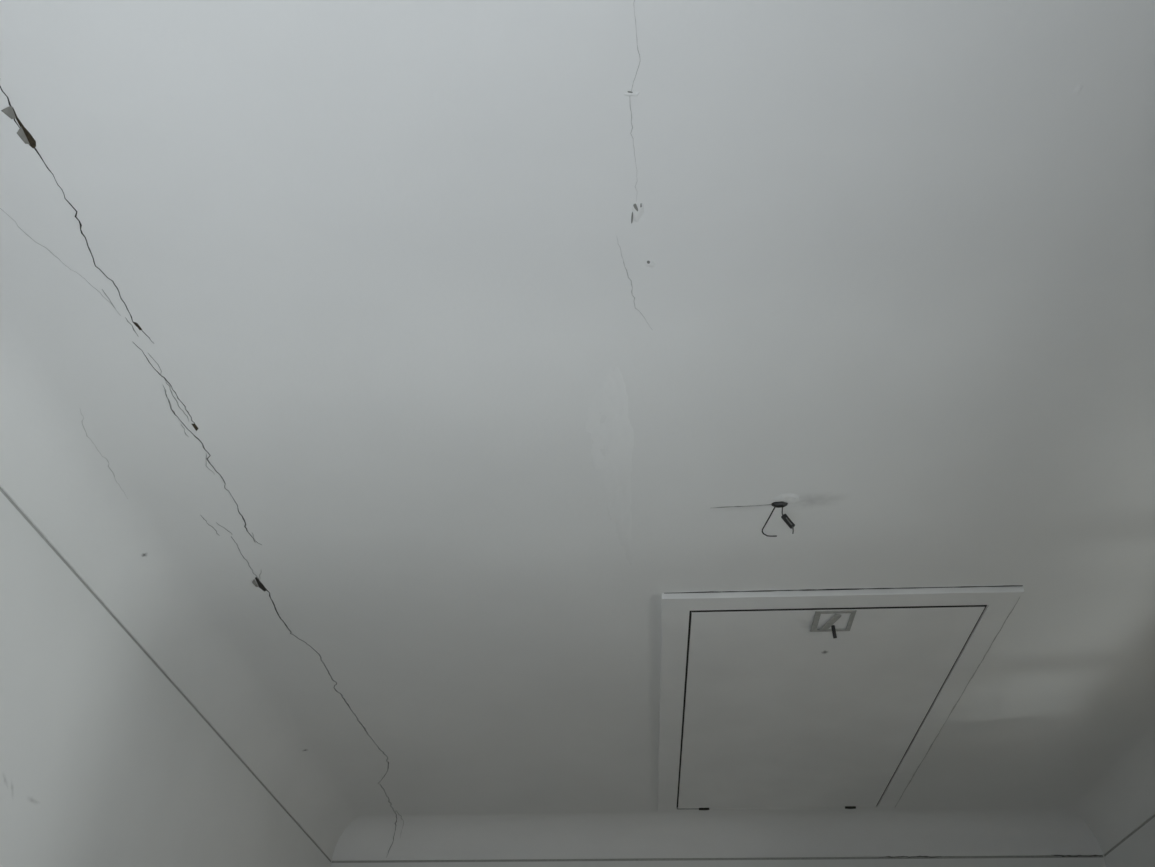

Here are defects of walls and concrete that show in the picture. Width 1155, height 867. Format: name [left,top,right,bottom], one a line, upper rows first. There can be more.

crack [0,86,404,855]